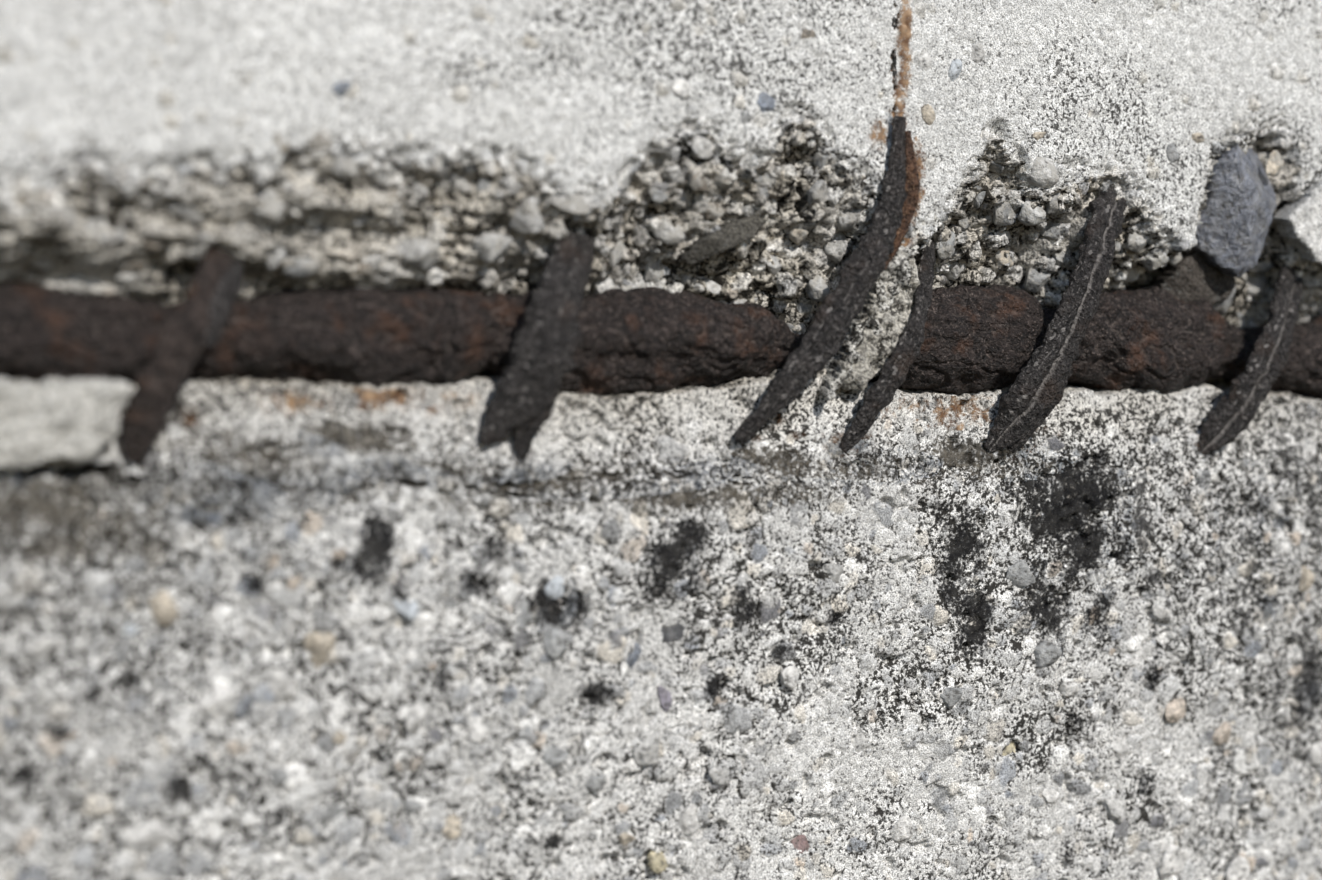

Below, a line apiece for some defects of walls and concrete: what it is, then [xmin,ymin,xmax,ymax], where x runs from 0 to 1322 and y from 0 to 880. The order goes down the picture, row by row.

rust [870,0,926,270]
spalling [0,114,879,334]
spalling [817,127,1322,400]
spalling [187,369,500,391]
spalling [576,366,783,398]
spalling [0,378,135,470]
rust [182,408,200,426]
rust [344,386,473,414]
rust [886,396,991,430]